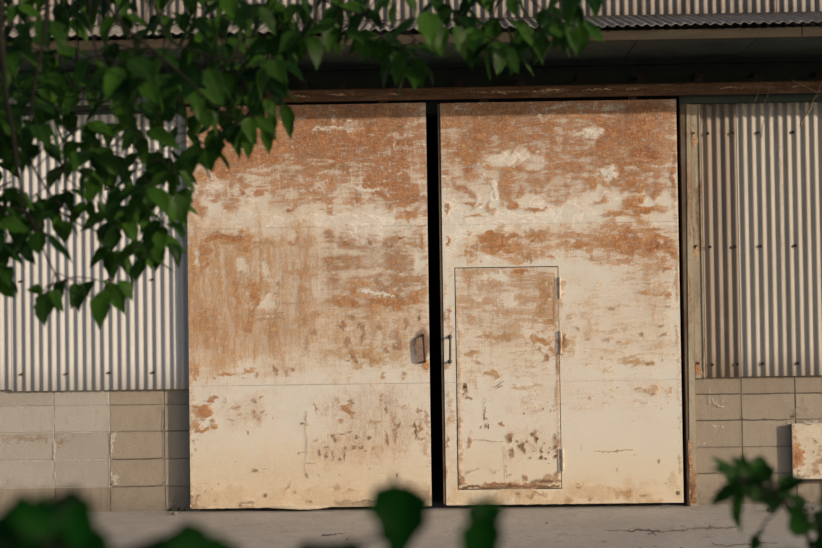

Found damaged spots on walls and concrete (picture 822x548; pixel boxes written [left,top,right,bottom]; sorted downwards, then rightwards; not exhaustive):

corrosion [186,103,431,476]
corrosion [440,99,697,504]
crack [298,411,316,478]
corrosion [793,429,822,477]
crack [607,526,777,547]